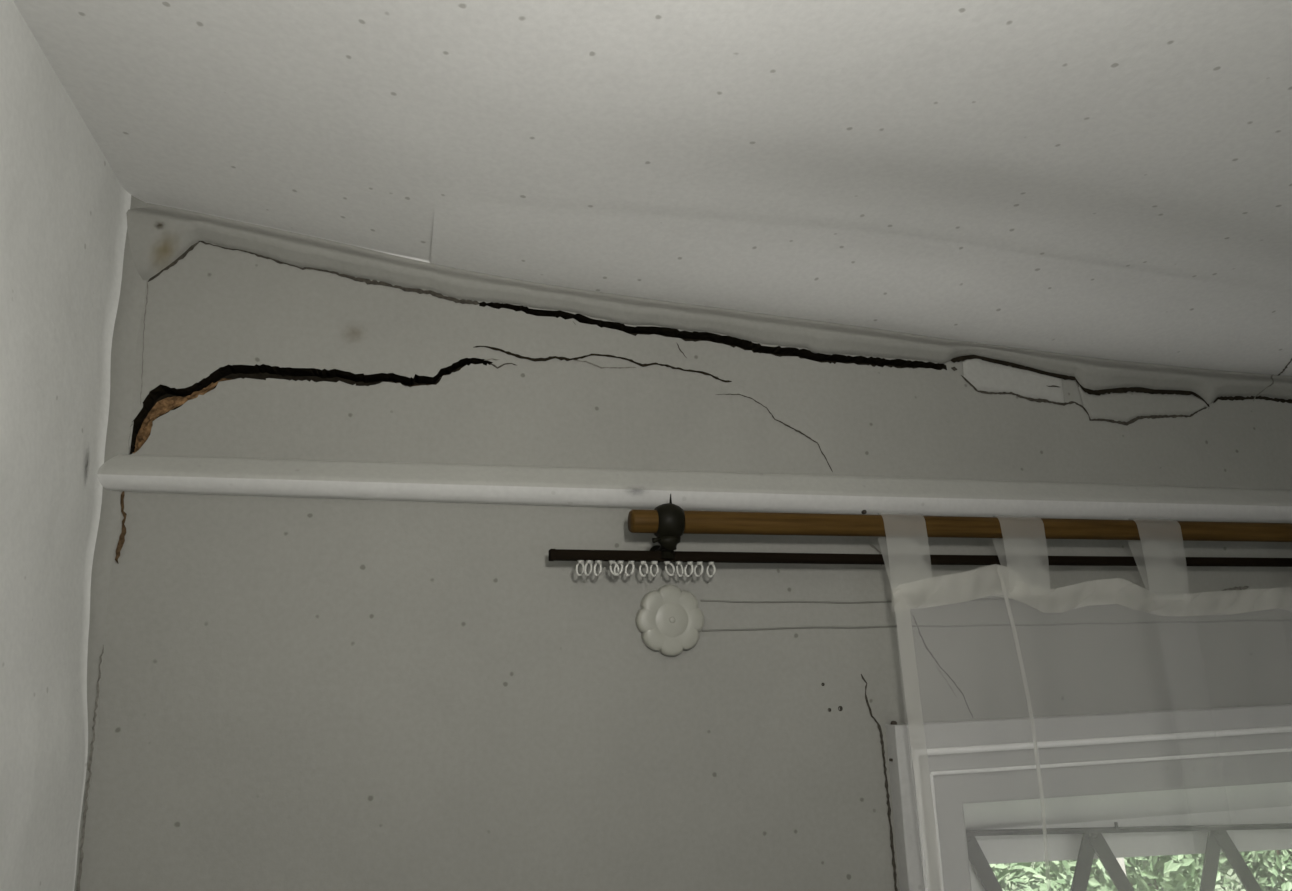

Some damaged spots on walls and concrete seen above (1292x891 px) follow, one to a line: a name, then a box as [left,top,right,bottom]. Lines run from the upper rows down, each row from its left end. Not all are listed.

crack [128,241,1292,472]
crack [115,491,127,564]